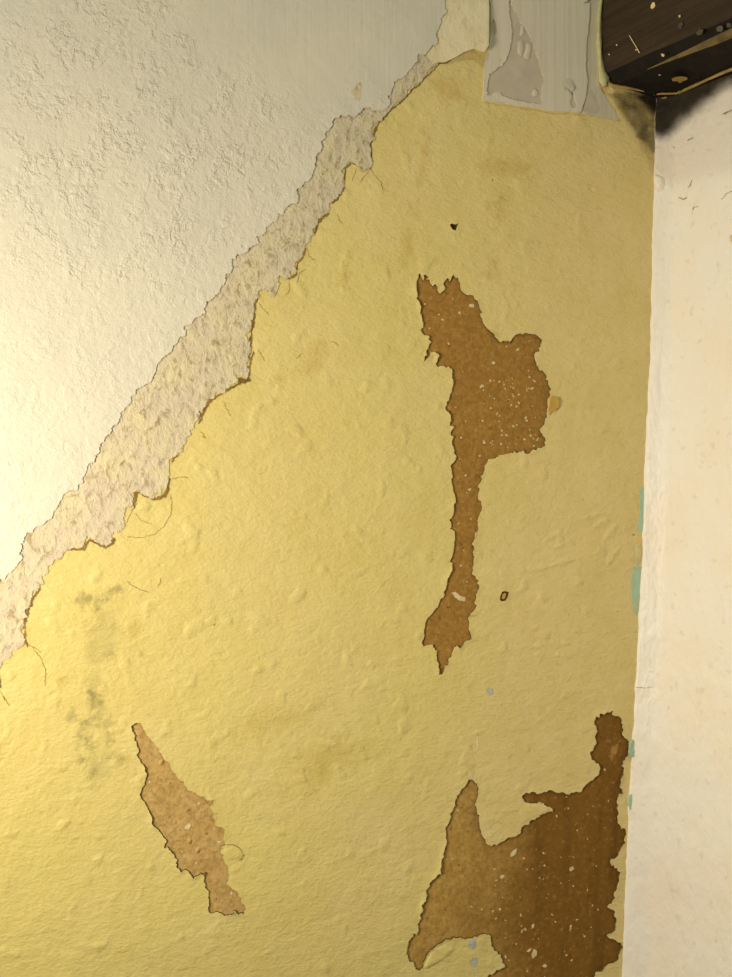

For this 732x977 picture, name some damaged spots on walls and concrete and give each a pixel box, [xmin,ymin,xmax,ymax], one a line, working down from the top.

peeling [486,0,544,104]
peeling [416,274,559,674]
peeling [131,723,245,915]
peeling [407,711,634,977]